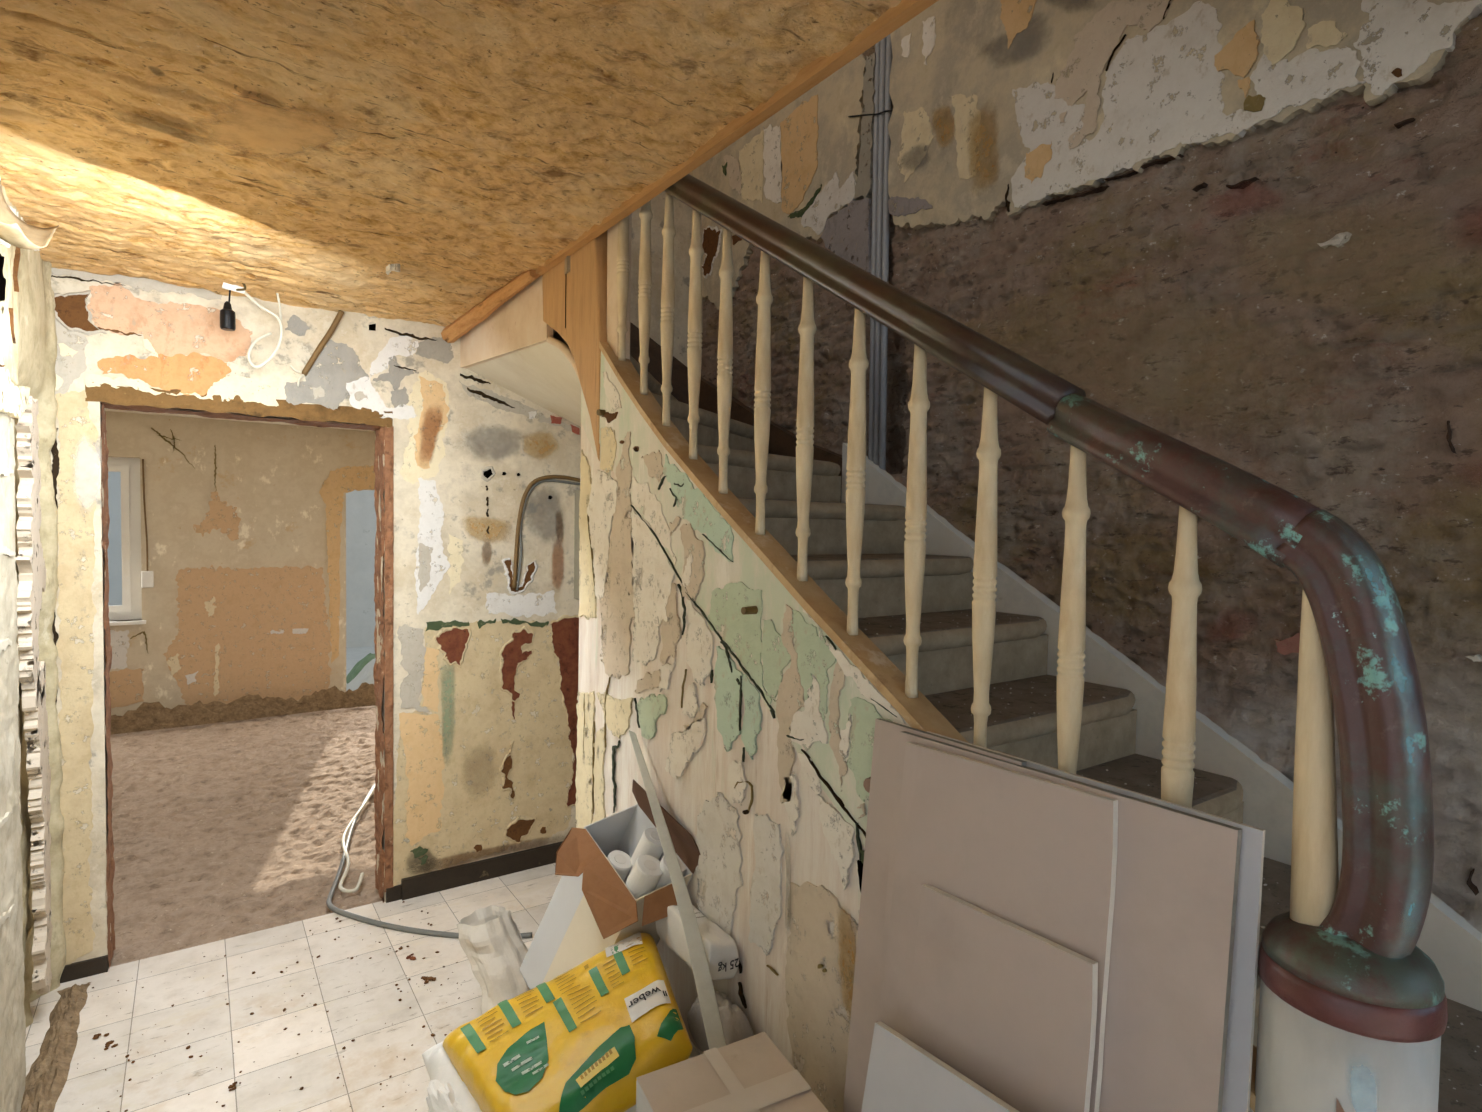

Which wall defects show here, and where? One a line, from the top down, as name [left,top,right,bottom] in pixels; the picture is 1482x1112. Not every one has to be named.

peeling [1024,0,1173,183]
peeling [1214,0,1347,112]
flaking render [285,315,310,336]
flaking render [284,337,454,484]
peeling [0,254,158,995]
peeling [393,553,693,886]
crack [612,698,640,813]
crack [630,476,775,762]
peeling [728,674,784,956]
peeling [797,752,865,890]
crack [801,749,866,838]
peeling [802,608,906,724]